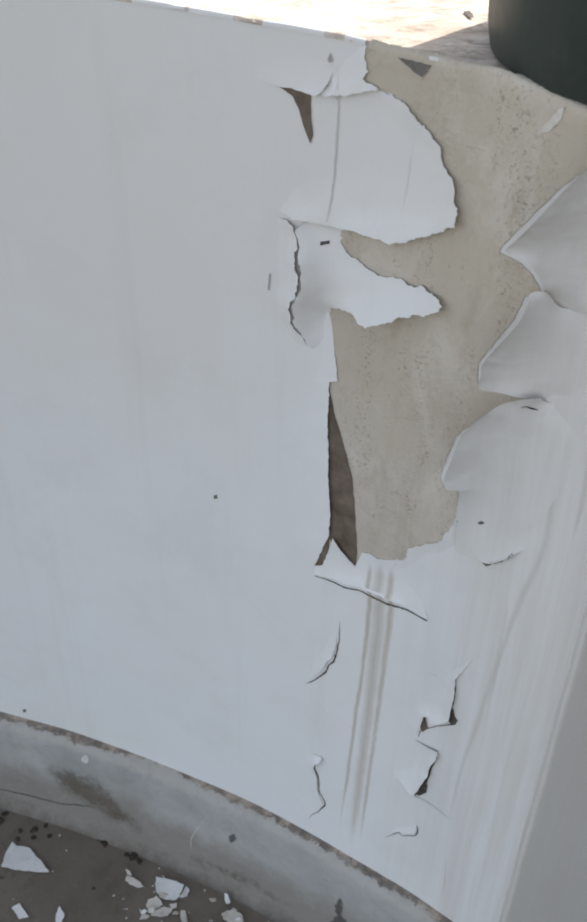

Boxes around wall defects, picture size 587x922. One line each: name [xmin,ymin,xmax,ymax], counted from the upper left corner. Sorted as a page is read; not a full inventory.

peeling [275,39,587,569]
crack [306,752,326,820]